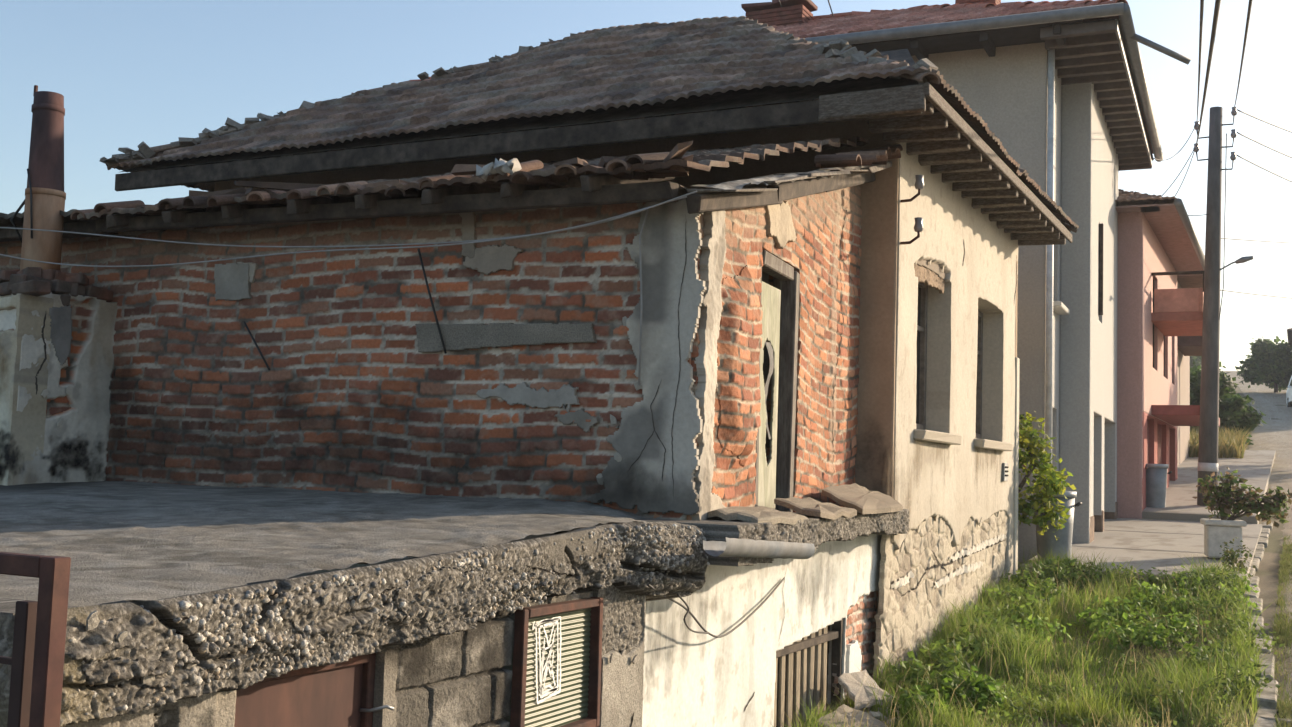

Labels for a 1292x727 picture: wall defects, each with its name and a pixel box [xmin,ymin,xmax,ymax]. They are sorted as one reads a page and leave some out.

flaking render [41,386,71,426]
flaking render [586,187,726,520]
crack [627,225,687,497]
crack [159,616,199,635]
flaking render [815,511,1008,727]